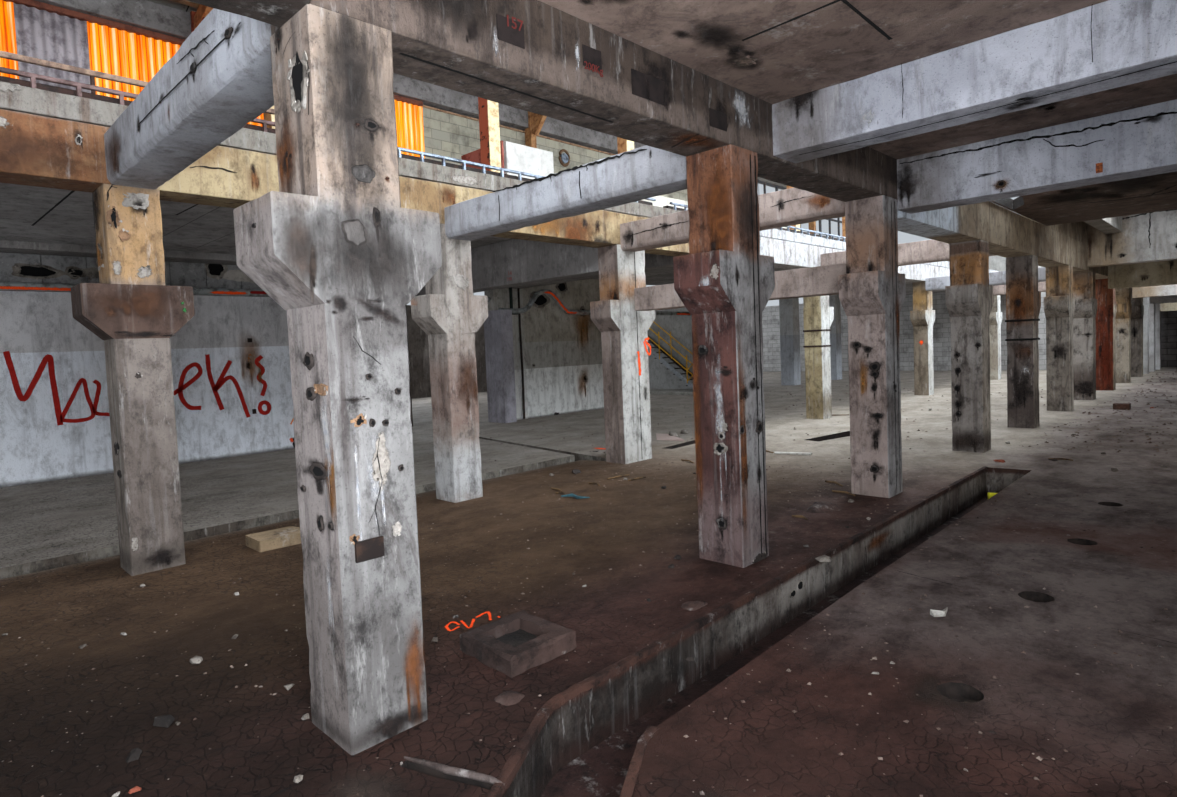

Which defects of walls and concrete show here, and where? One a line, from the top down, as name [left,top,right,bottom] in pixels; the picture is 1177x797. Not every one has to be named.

crack [138,30,226,126]
crack [799,4,1177,155]
crack [900,112,1177,164]
spalling [392,522,402,537]
corrosion [407,634,422,710]